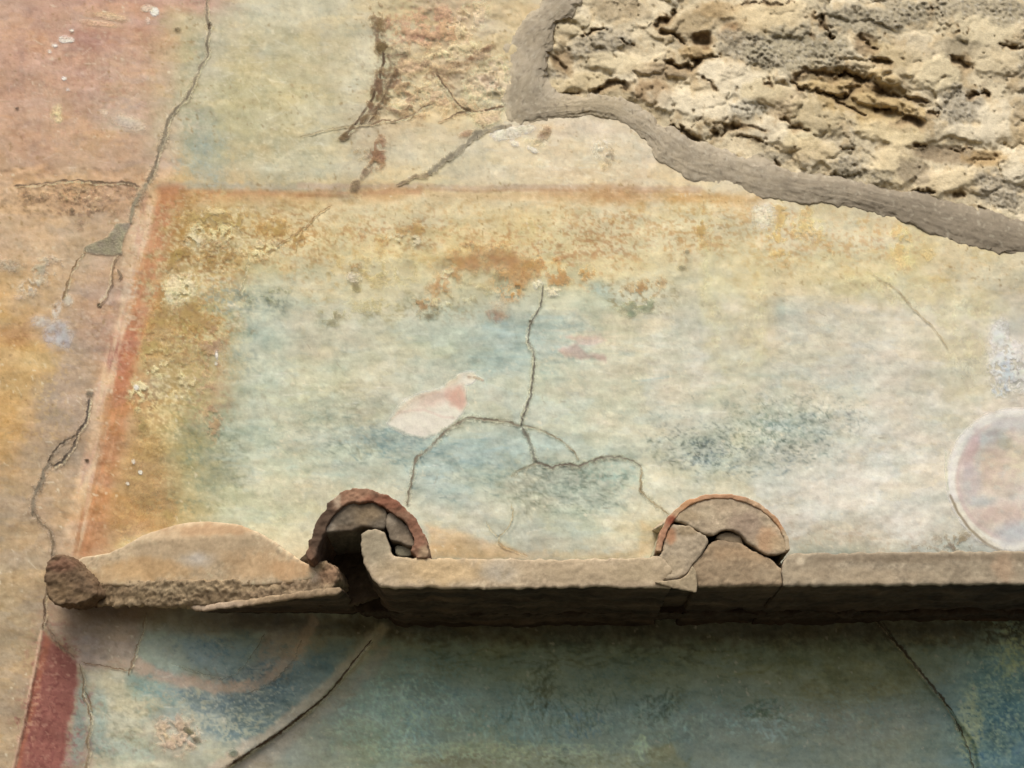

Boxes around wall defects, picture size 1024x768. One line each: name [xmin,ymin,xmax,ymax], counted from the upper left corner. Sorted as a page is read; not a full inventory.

crack [15,0,212,223]
crack [301,51,512,186]
spalling [546,0,1024,221]
crack [100,255,122,306]
crack [29,397,91,558]
crack [406,287,669,515]
crack [225,640,372,768]
crack [878,622,974,768]